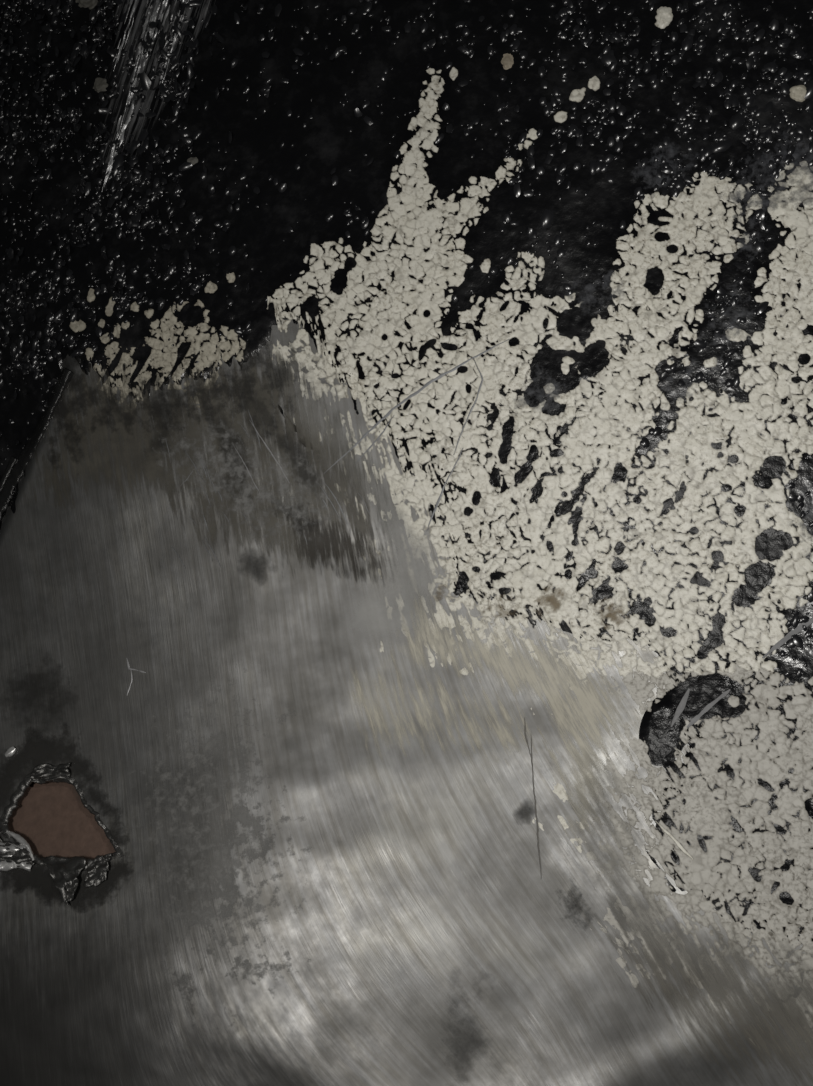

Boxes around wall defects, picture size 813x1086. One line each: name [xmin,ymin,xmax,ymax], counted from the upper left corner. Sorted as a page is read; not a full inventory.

water stain [354,676,526,748]
water stain [132,733,282,928]